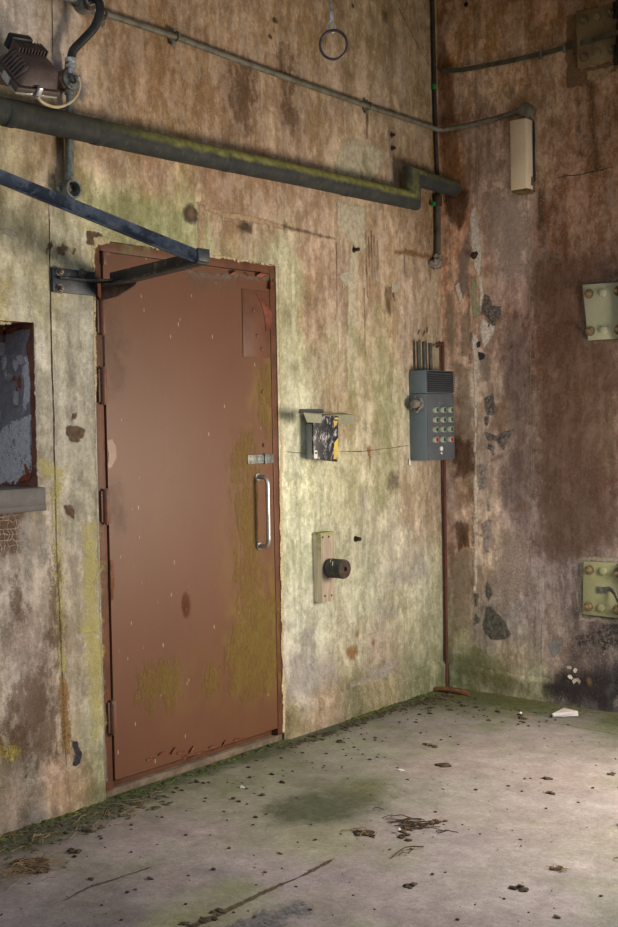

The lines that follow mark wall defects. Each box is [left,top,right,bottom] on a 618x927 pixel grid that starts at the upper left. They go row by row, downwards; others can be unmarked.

spalling [481,294,501,327]
peeling [0,321,40,485]
spalling [484,394,514,455]
spalling [476,464,492,553]
damp [10,580,29,621]
damp [47,553,62,647]
spalling [473,582,511,640]
damp [0,663,59,769]
damp [544,669,618,711]